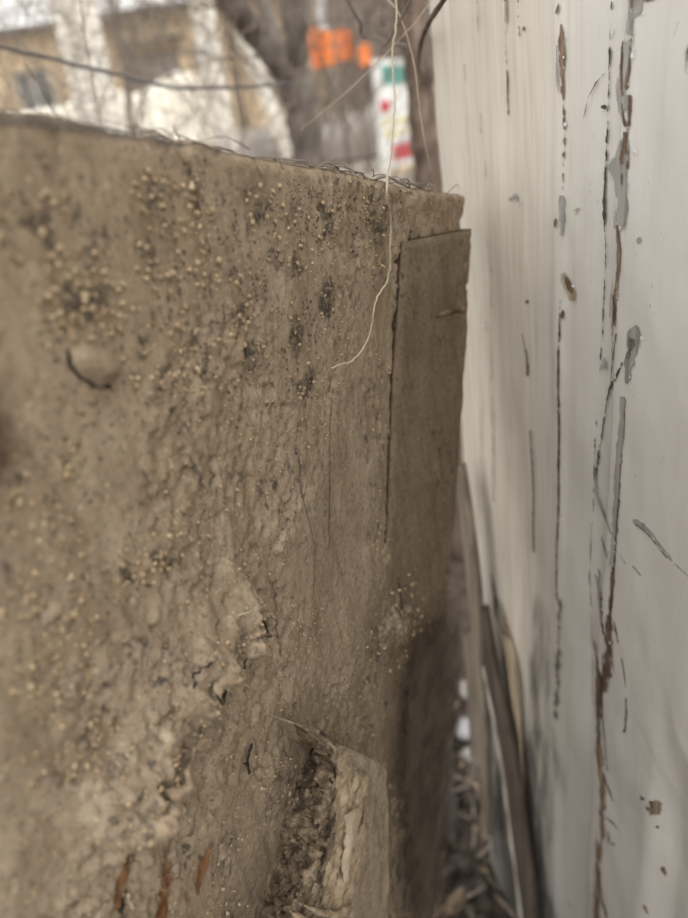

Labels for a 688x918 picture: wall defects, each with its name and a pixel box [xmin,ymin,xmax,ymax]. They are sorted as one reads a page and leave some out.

peeling [607,0,649,232]
peeling [560,271,576,300]
peeling [624,326,643,383]
peeling [591,570,618,918]